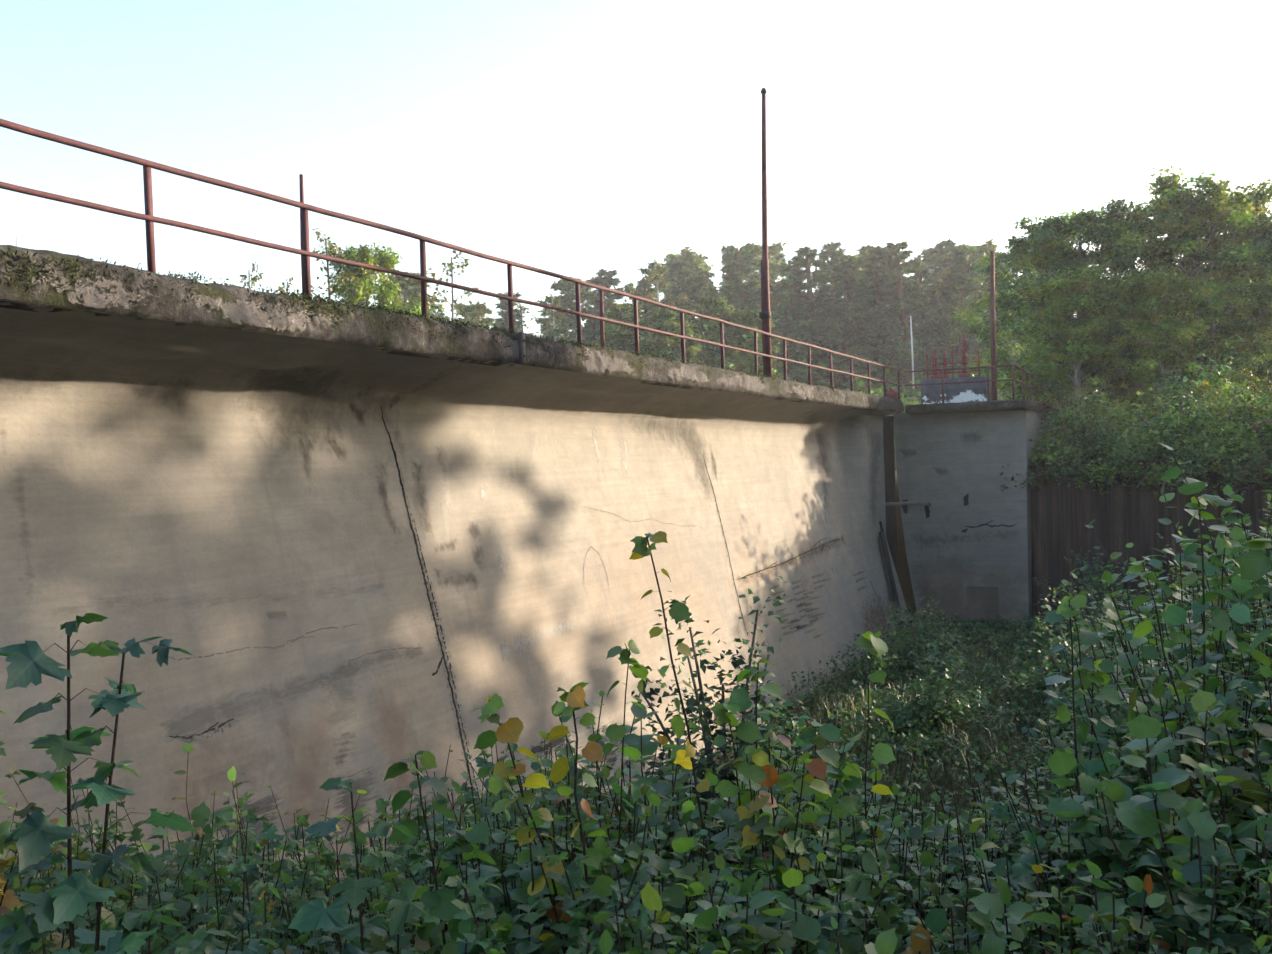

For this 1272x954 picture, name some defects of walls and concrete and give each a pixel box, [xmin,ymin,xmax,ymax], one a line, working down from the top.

crack [168,407,480,798]
crack [582,456,840,634]
crack [965,520,1017,528]